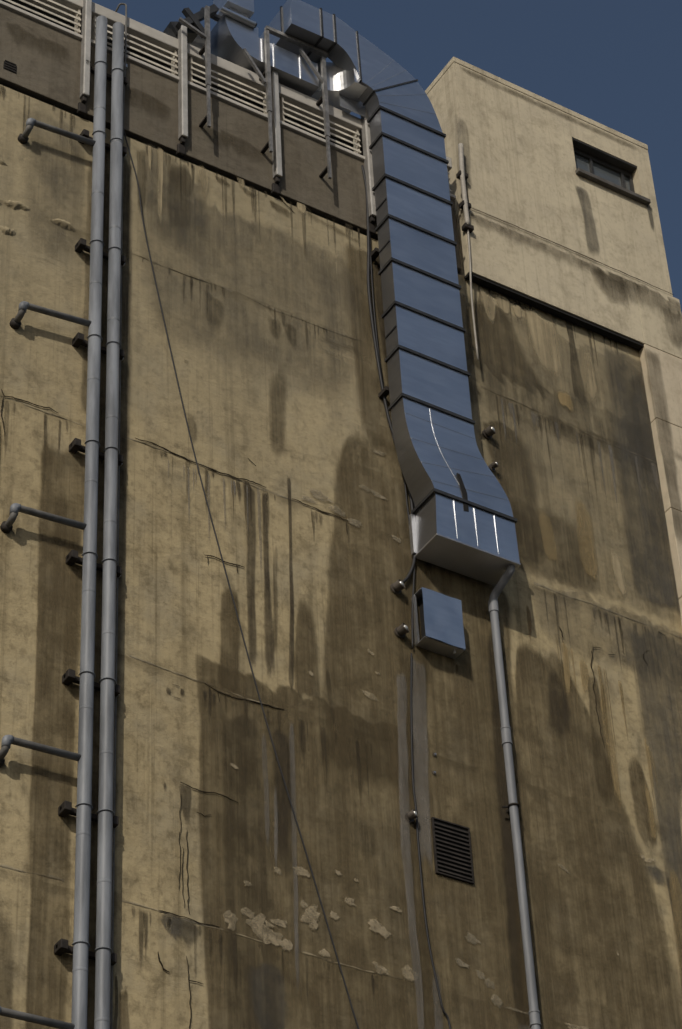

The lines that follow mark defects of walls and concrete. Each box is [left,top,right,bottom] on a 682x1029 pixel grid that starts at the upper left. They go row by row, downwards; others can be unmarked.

crack [1,389,58,435]
water stain [98,151,110,513]
water stain [121,146,163,350]
crack [136,438,265,487]
crack [294,499,348,531]
water stain [602,354,680,607]
water stain [32,421,83,878]
water stain [89,662,101,952]
crack [205,683,281,709]
water stain [181,429,682,1029]
spalling [225,911,293,951]
spalling [301,901,339,930]